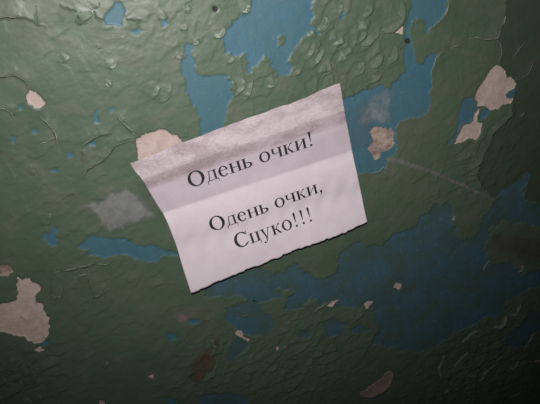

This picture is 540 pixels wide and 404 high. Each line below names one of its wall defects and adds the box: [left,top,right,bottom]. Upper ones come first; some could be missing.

peeling [175,0,330,136]
spalling [26,90,45,108]
spalling [136,129,182,160]
peeling [204,0,540,353]
water stain [86,190,152,231]
peeling [77,235,178,262]
spalling [0,264,50,352]
peeling [360,371,394,399]